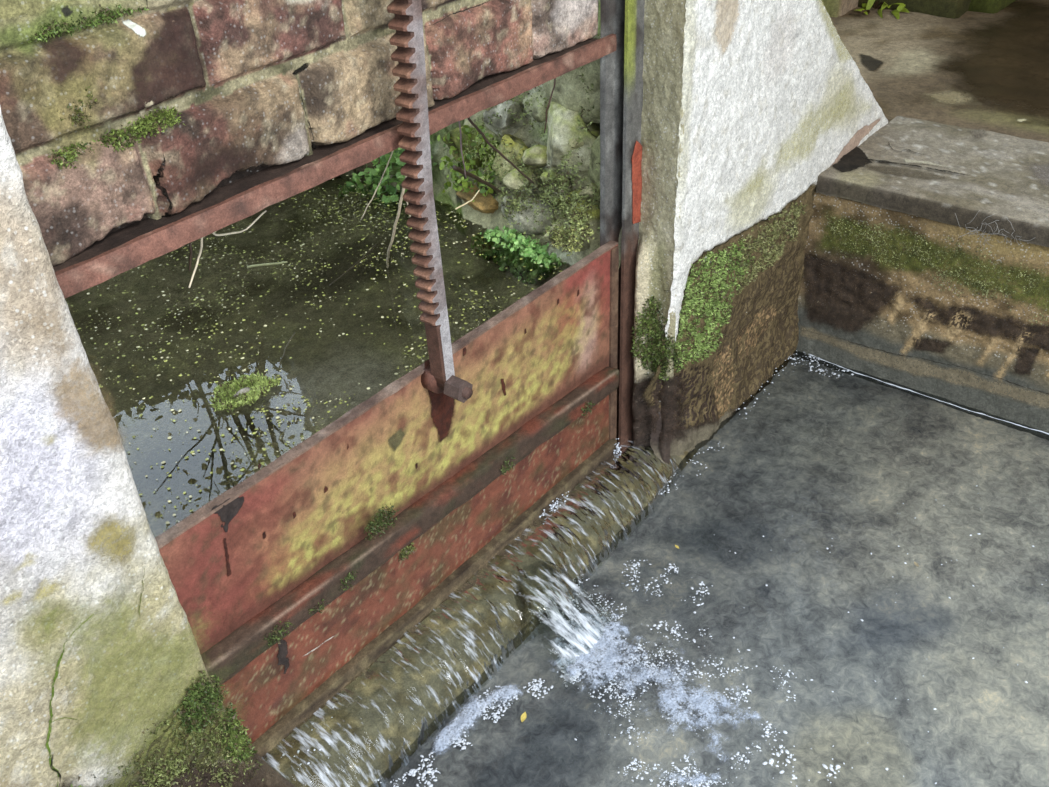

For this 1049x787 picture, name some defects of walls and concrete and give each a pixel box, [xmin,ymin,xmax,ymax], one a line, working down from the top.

rust [388,430,405,450]
rust [428,390,455,442]
crack [46,615,92,787]